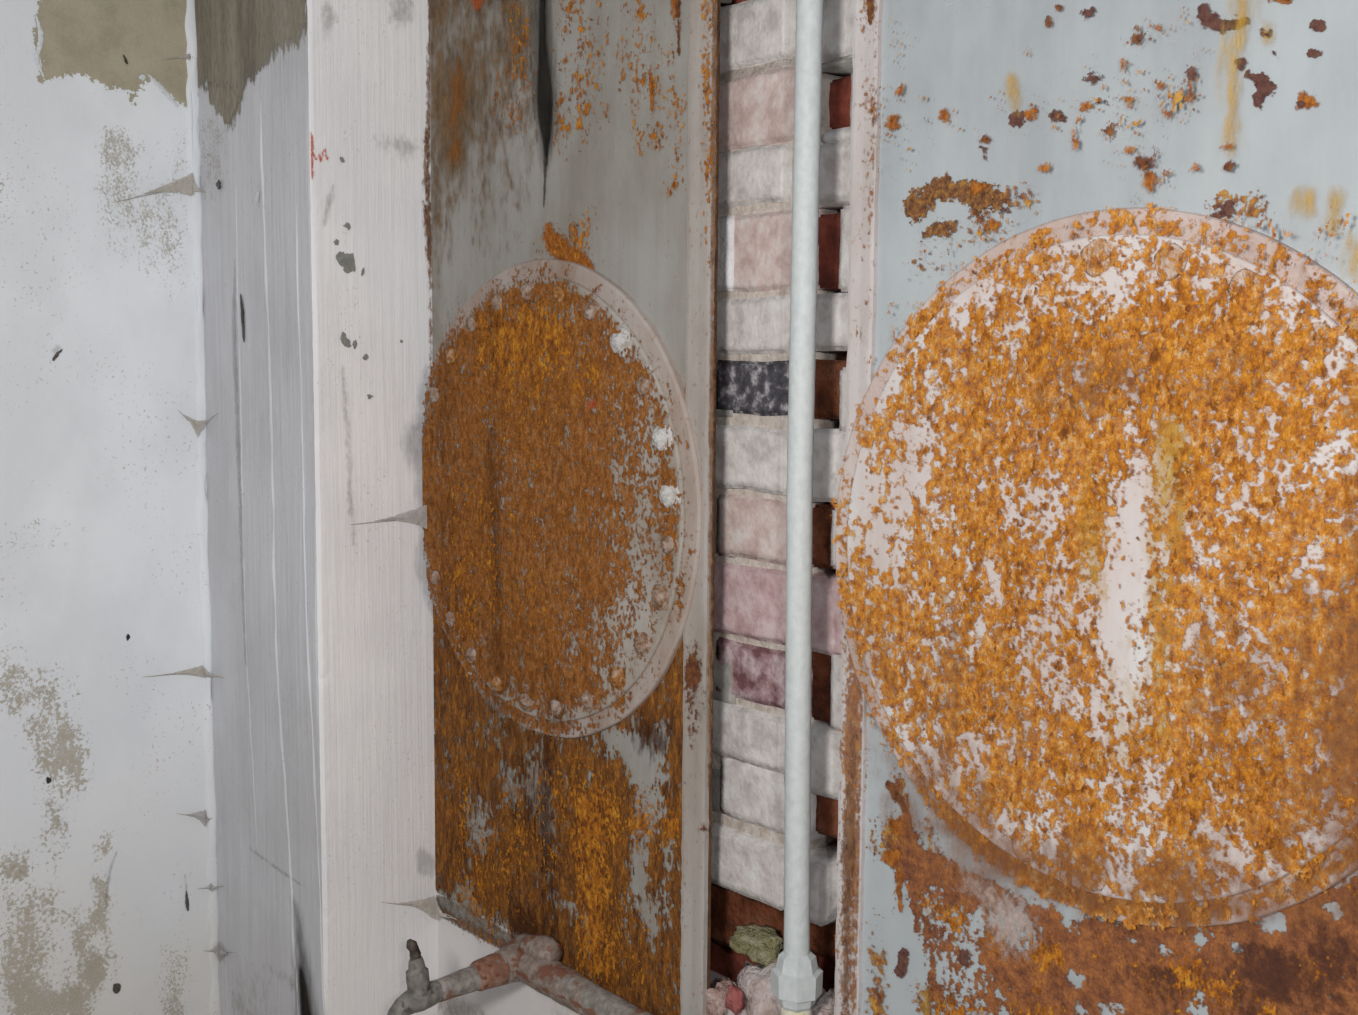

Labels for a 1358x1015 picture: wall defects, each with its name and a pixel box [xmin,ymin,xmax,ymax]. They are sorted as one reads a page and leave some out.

peeling [31,0,307,160]
corrosion [422,0,718,1015]
corrosion [831,0,1358,1015]